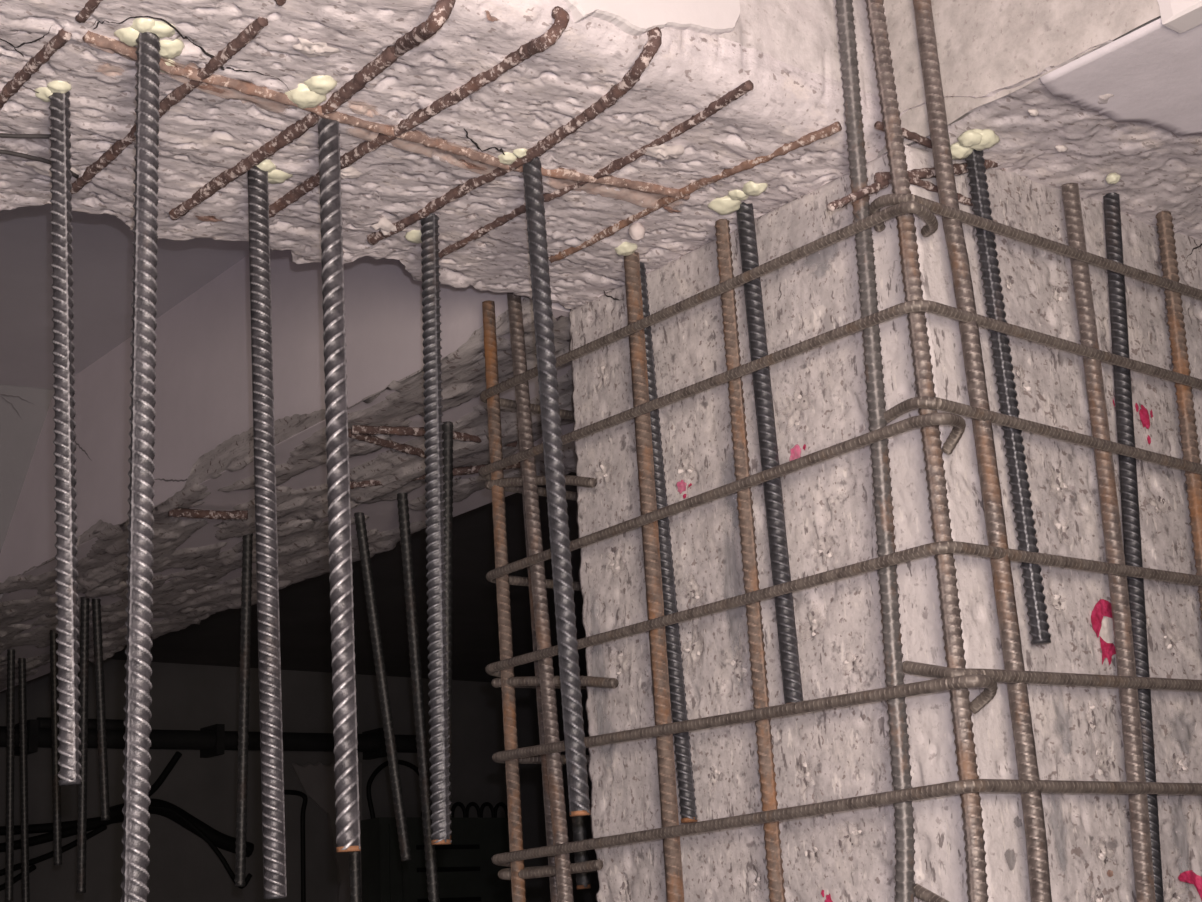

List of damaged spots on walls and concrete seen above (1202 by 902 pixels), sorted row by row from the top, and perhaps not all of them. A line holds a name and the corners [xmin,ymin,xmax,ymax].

corrosion [0,0,137,110]
corrosion [70,124,136,194]
corrosion [158,0,842,263]
spalling [860,89,888,164]
spalling [0,0,850,902]